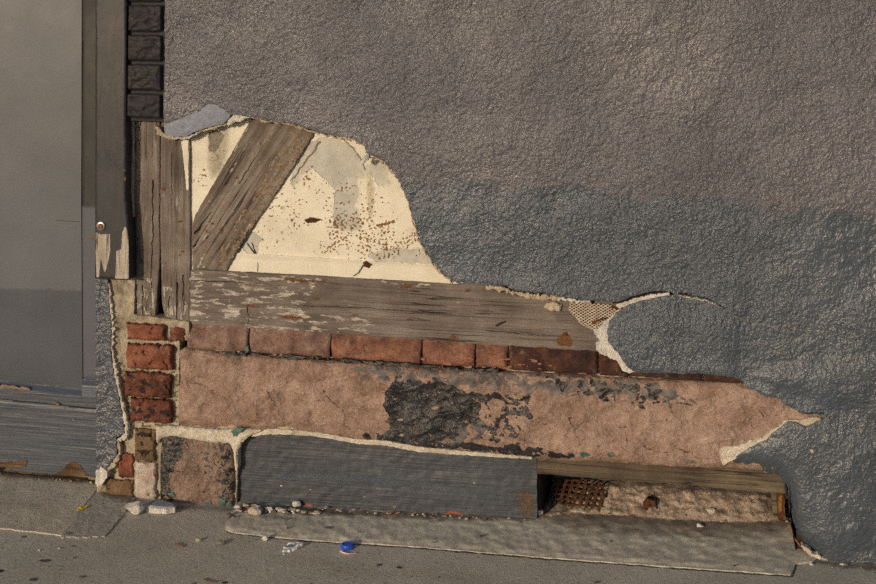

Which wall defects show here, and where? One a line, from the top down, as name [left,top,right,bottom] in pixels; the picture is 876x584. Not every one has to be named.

peeling [155,104,453,284]
corrosion [243,166,417,268]
peeling [0,183,374,487]
peeling [225,285,696,459]
crack [613,291,823,333]
peeling [160,427,355,515]
flaking render [719,416,821,465]
spalling [801,542,828,561]